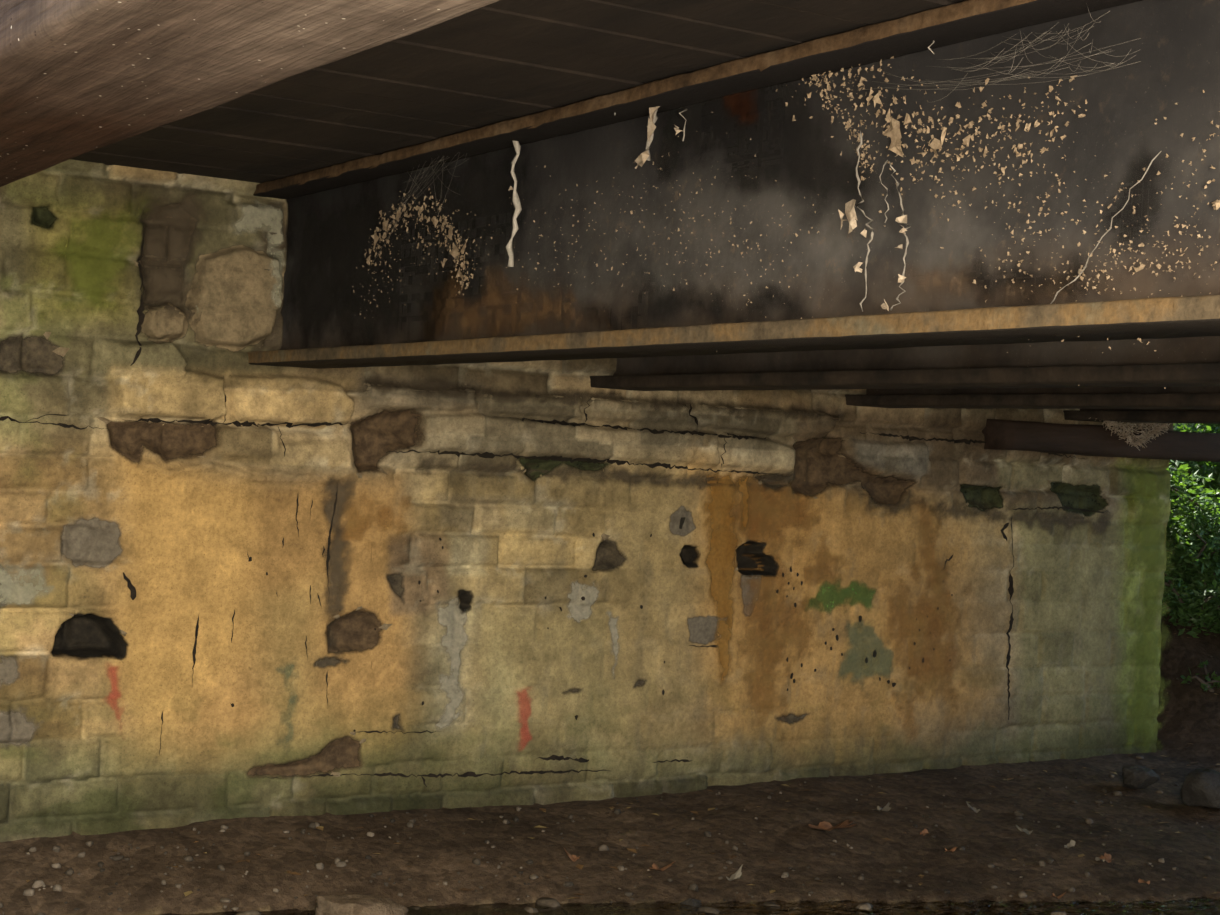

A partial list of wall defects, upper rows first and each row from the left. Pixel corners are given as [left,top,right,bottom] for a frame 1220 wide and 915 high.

peeling [776,56,1220,303]
peeling [352,188,503,318]
spalling [0,332,70,376]
spalling [96,417,218,464]
crack [0,376,347,457]
spalling [755,437,916,506]
crack [860,432,986,445]
water stain [324,480,353,643]
spalling [314,606,392,668]
corrosion [705,474,750,683]
crack [1000,506,1107,720]
spalling [246,730,366,778]